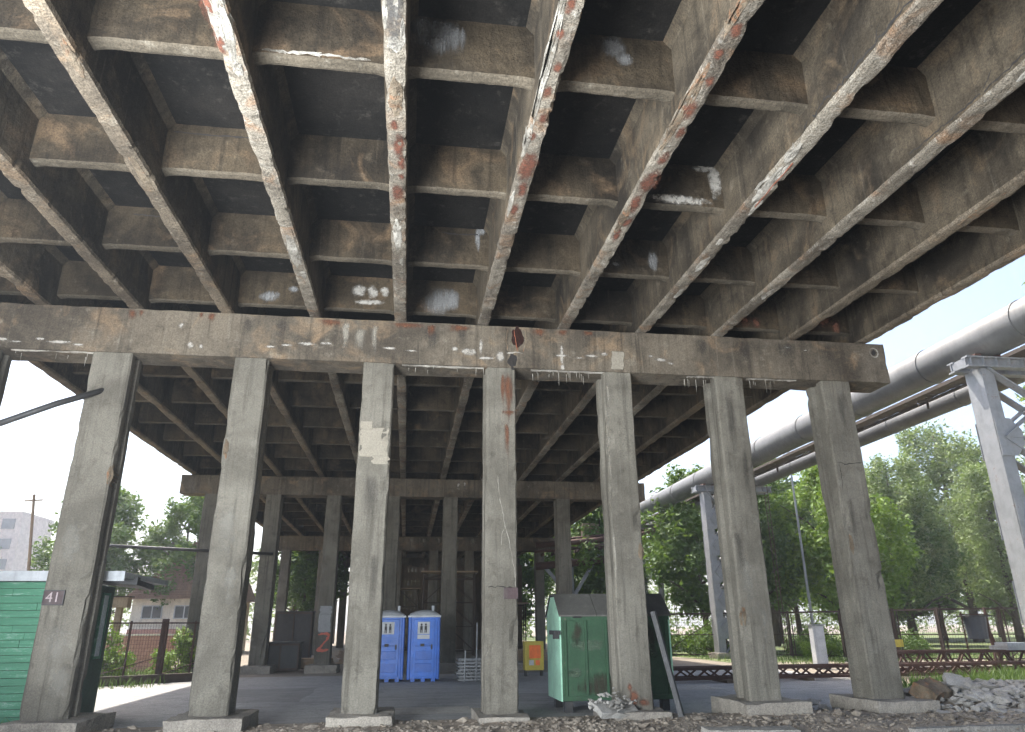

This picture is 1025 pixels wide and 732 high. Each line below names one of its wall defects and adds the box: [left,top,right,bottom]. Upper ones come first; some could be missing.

rust [391,120,405,200]
rust [511,154,537,215]
rust [613,153,669,239]
leakage [653,194,701,204]
leakage [695,166,721,192]
spalling [480,326,527,370]
rust [501,376,513,444]
peeling [371,456,390,465]